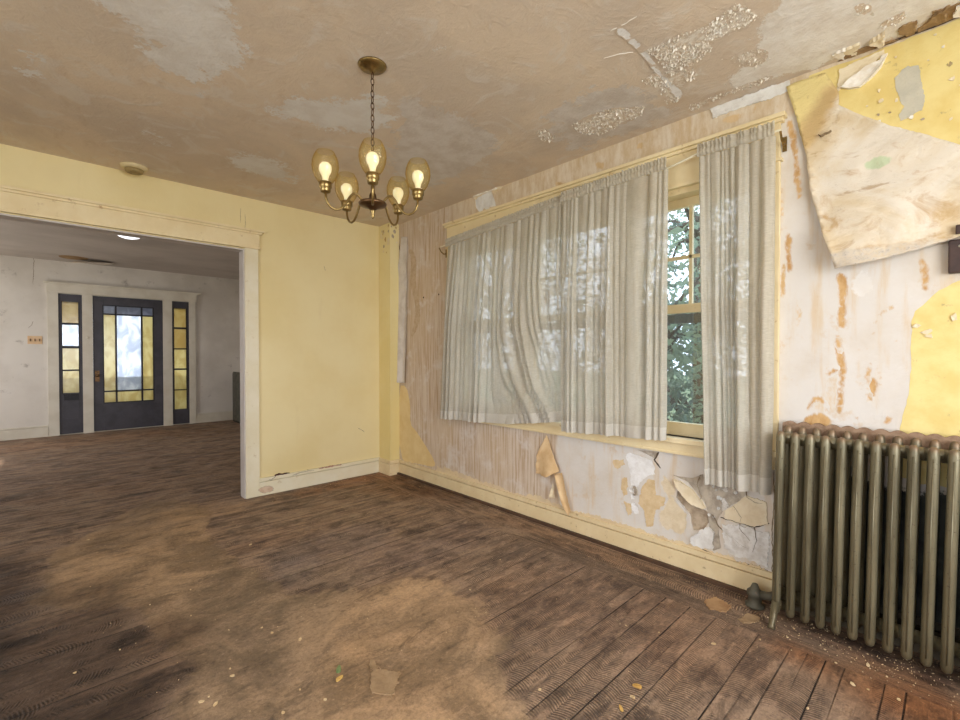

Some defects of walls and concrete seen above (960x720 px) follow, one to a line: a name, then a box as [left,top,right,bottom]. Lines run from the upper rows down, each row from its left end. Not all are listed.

peeling [642,0,960,121]
leakage [780,118,823,331]
leakage [795,272,884,429]
peeling [535,435,571,515]
flaking render [612,452,771,568]
crack [737,470,775,572]